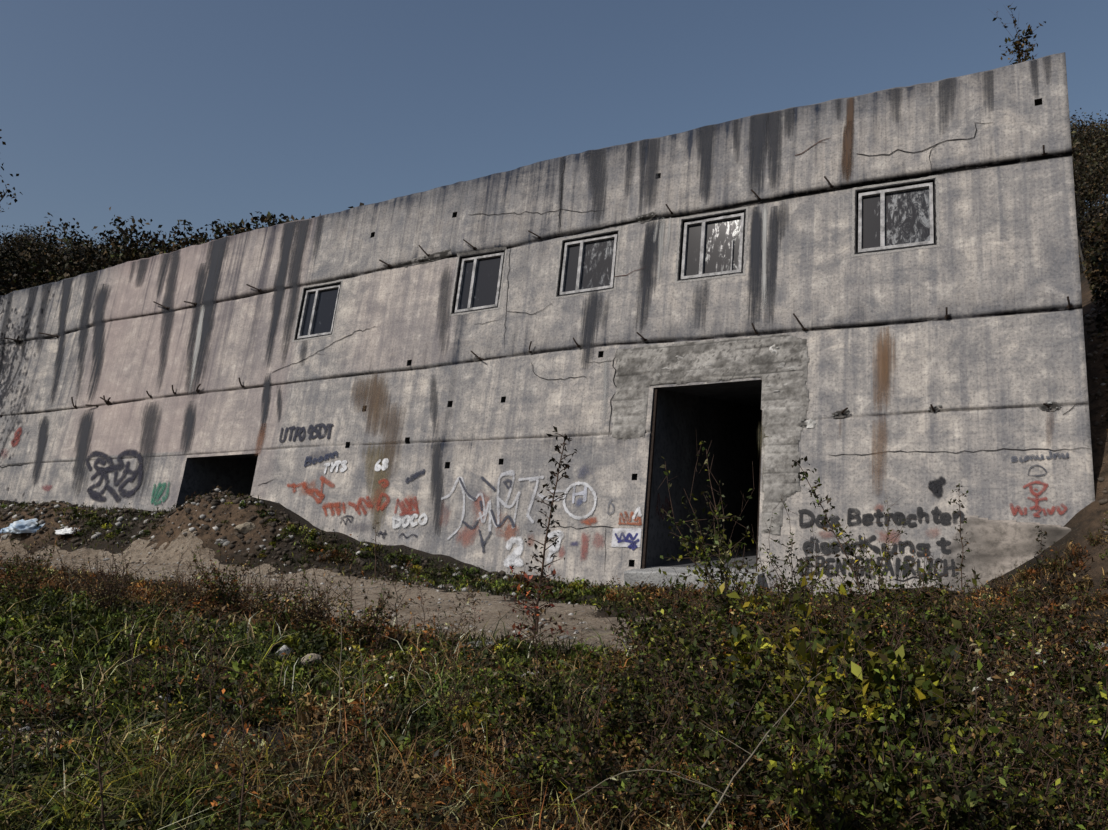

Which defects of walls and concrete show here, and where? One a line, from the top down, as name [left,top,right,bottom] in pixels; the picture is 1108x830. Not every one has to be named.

water stain [733,108,793,190]
rust [842,97,854,180]
crack [856,122,992,163]
water stain [22,278,73,403]
water stain [73,271,110,493]
water stain [157,250,179,384]
water stain [181,236,230,453]
water stain [260,215,324,433]
water stain [636,219,670,330]
water stain [749,205,785,324]
rust [877,333,891,401]
crack [828,447,1090,456]